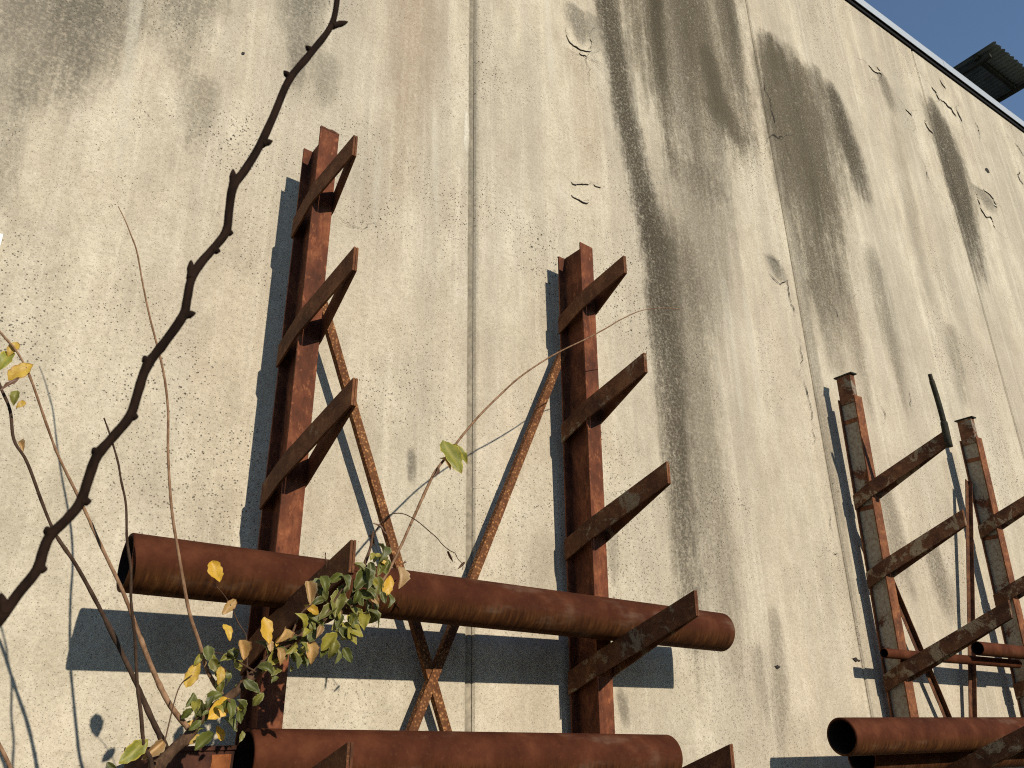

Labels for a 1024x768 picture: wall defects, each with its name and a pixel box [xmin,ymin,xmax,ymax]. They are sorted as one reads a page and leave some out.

water stain [14,0,129,85]
water stain [632,0,745,171]
water stain [760,35,868,288]
water stain [930,102,989,276]
water stain [595,0,695,592]
crack [766,257,814,313]